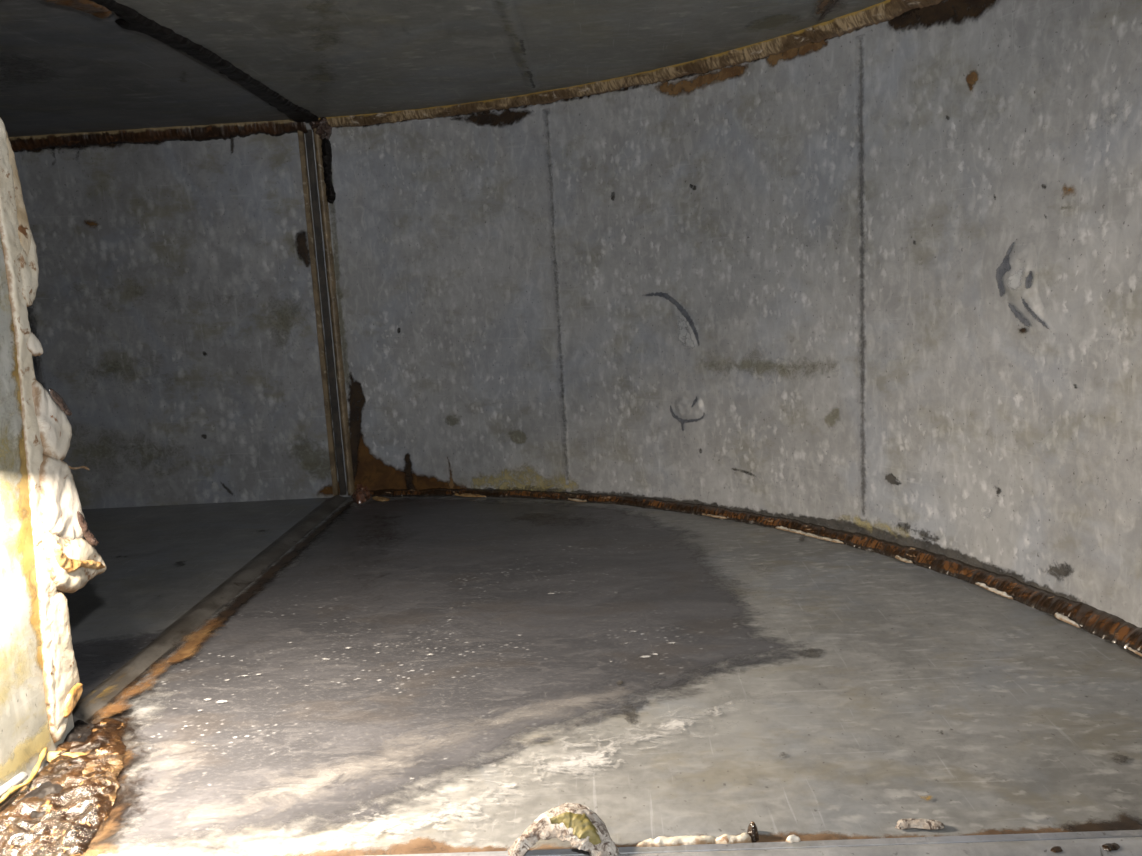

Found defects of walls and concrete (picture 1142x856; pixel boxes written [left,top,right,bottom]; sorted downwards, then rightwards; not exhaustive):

rust [966,71,978,91]
leakage [0,323,43,673]
rust [100,374,469,717]
leakage [73,633,161,701]
leakage [102,467,794,851]
leakage [0,722,50,781]
rust [275,837,508,856]
peeling [508,803,619,856]
rust [756,832,940,843]
rust [960,813,1142,853]